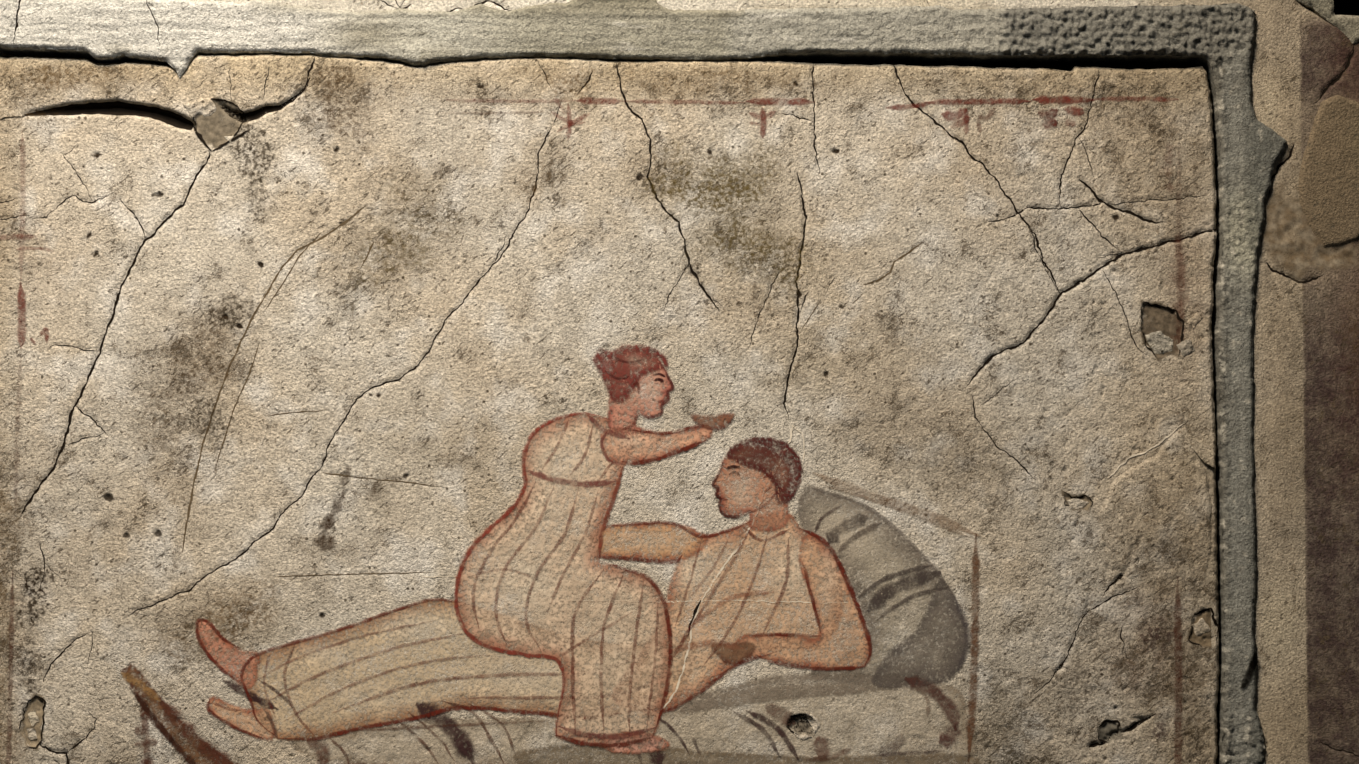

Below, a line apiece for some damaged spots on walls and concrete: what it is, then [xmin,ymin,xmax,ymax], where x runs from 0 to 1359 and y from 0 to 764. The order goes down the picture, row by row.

spalling [183,97,276,210]
crack [0,145,210,591]
spalling [188,400,231,434]
spalling [208,286,253,328]
crack [126,58,725,617]
crack [572,65,852,718]
crack [894,65,1220,480]
spalling [1140,301,1202,360]
crack [1033,574,1137,694]
spalling [786,713,820,740]